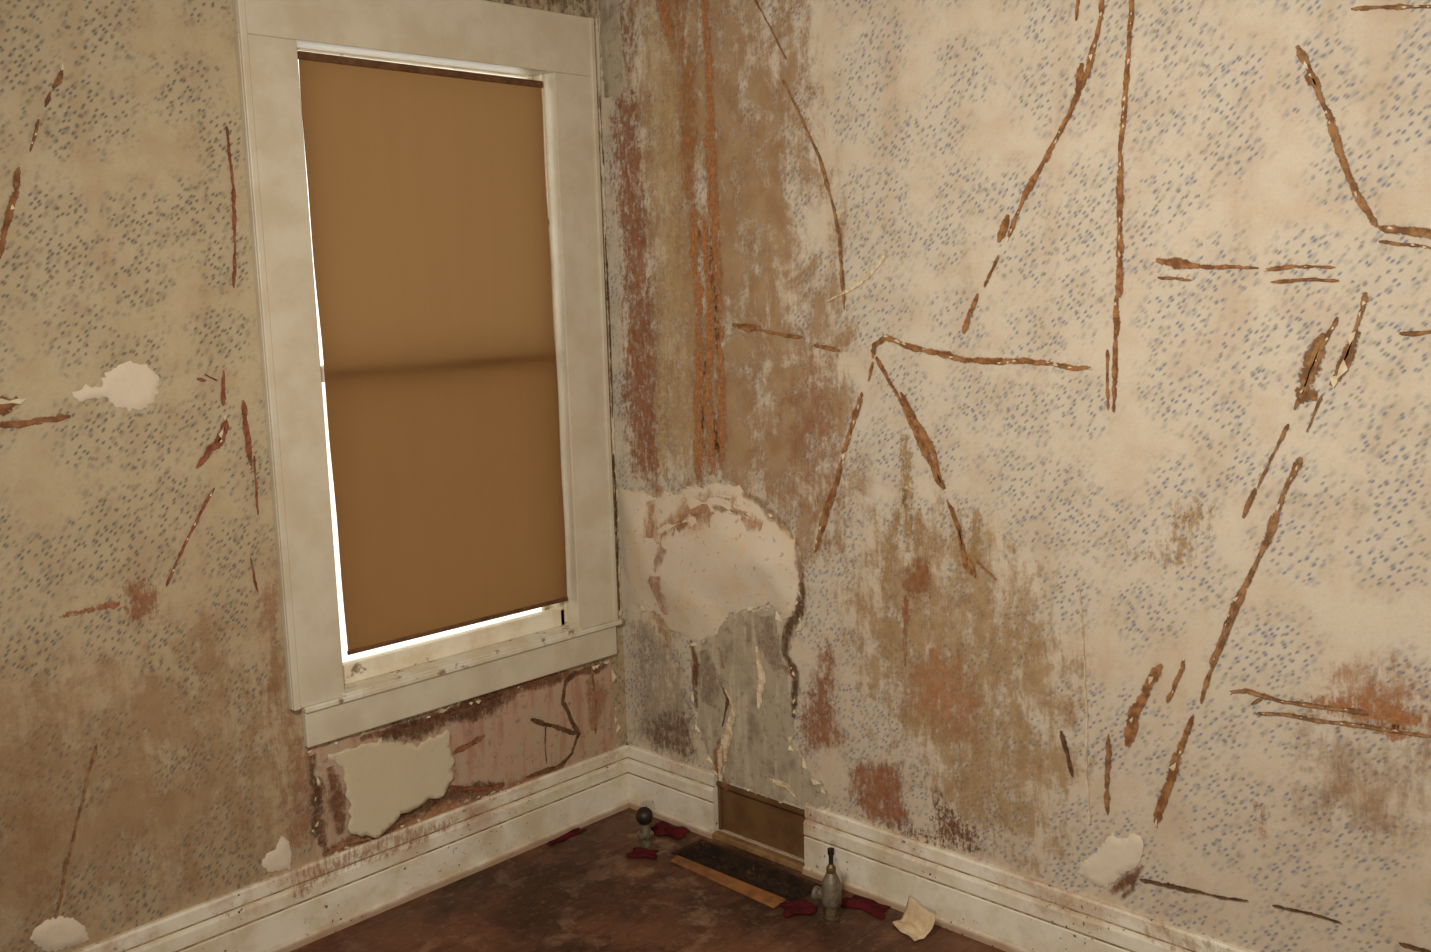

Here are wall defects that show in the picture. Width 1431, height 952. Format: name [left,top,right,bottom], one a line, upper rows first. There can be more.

crack [0,64,64,258]
crack [226,126,237,288]
leakage [610,0,862,563]
crack [0,414,71,428]
crack [241,400,259,515]
crack [732,0,1431,827]
crack [54,744,98,919]
peeling [294,660,621,897]
flaking render [689,582,831,811]
leakage [843,434,1083,853]
crack [1140,878,1341,924]
crack [1399,942,1431,952]